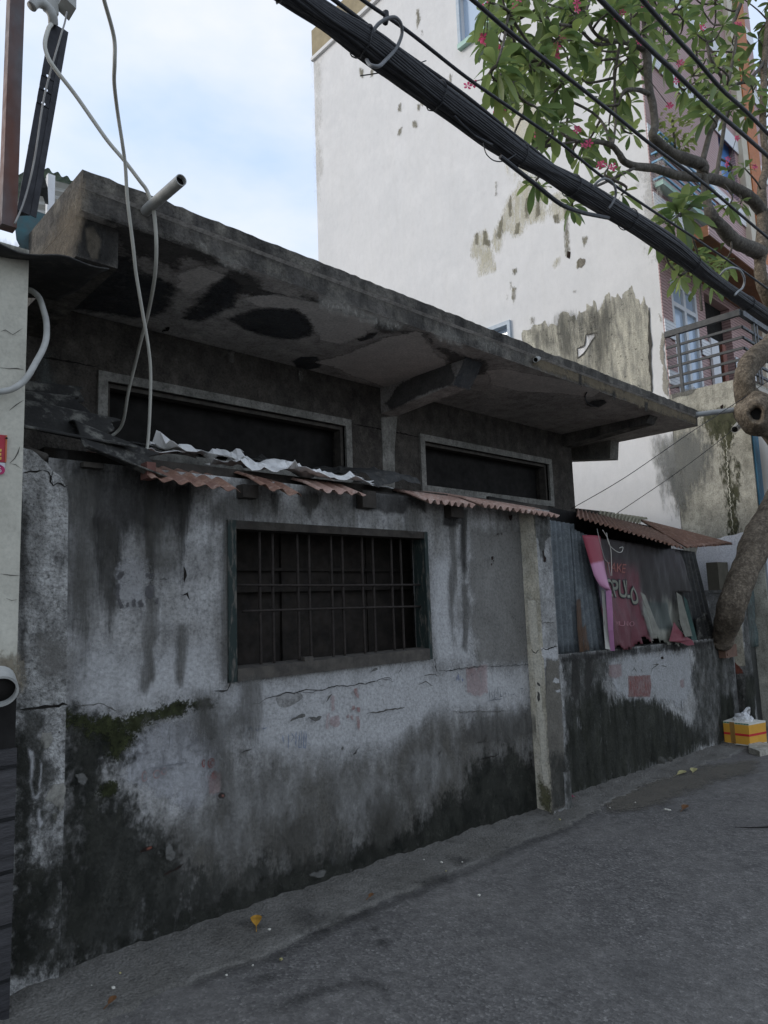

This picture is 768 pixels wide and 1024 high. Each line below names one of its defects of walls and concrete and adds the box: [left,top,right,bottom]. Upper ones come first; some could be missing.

damp [74,215,313,340]
peeling [472,184,565,275]
peeling [521,286,696,399]
damp [533,357,743,536]
damp [68,476,122,639]
damp [141,598,159,692]
damp [177,624,186,684]
crack [263,622,557,701]
damp [545,603,759,813]
damp [10,702,537,981]